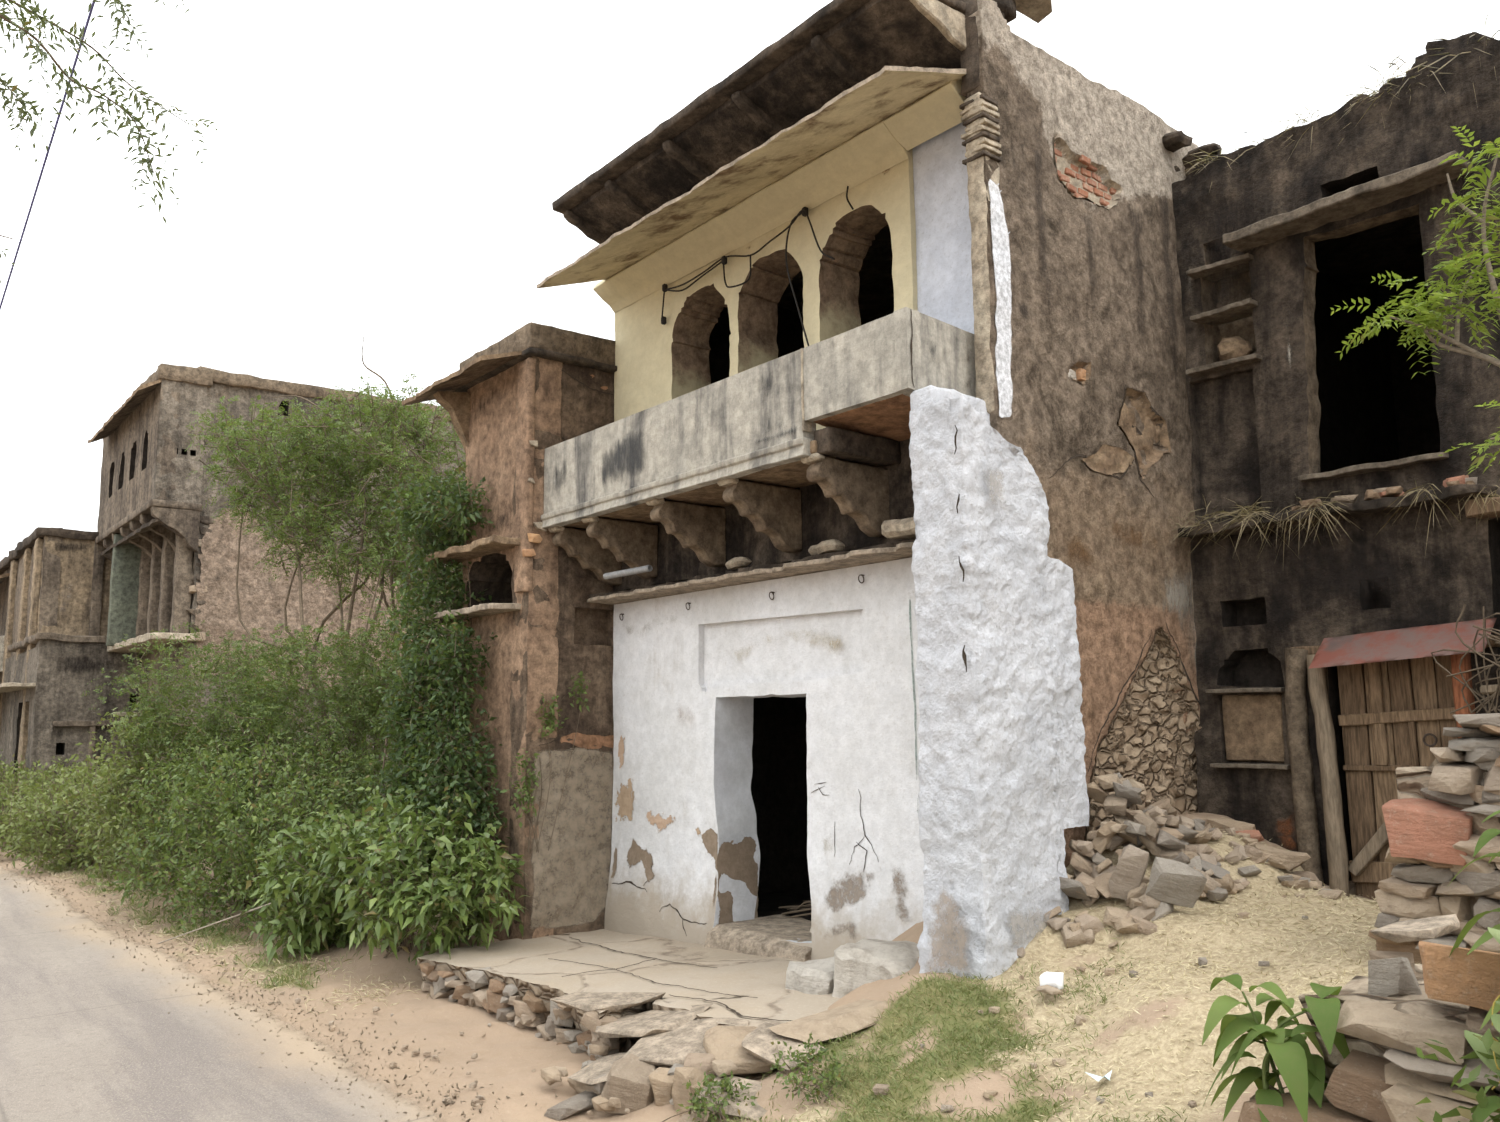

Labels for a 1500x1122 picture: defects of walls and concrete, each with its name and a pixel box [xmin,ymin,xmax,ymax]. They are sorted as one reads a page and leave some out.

spalling [1052,134,1123,210]
spalling [1067,361,1091,385]
damp [602,430,642,482]
spalling [1050,384,1171,497]
spalling [1085,624,1202,841]
peeling [531,732,675,928]
spalling [695,828,759,924]
crack [834,789,879,871]
crack [548,864,793,1021]